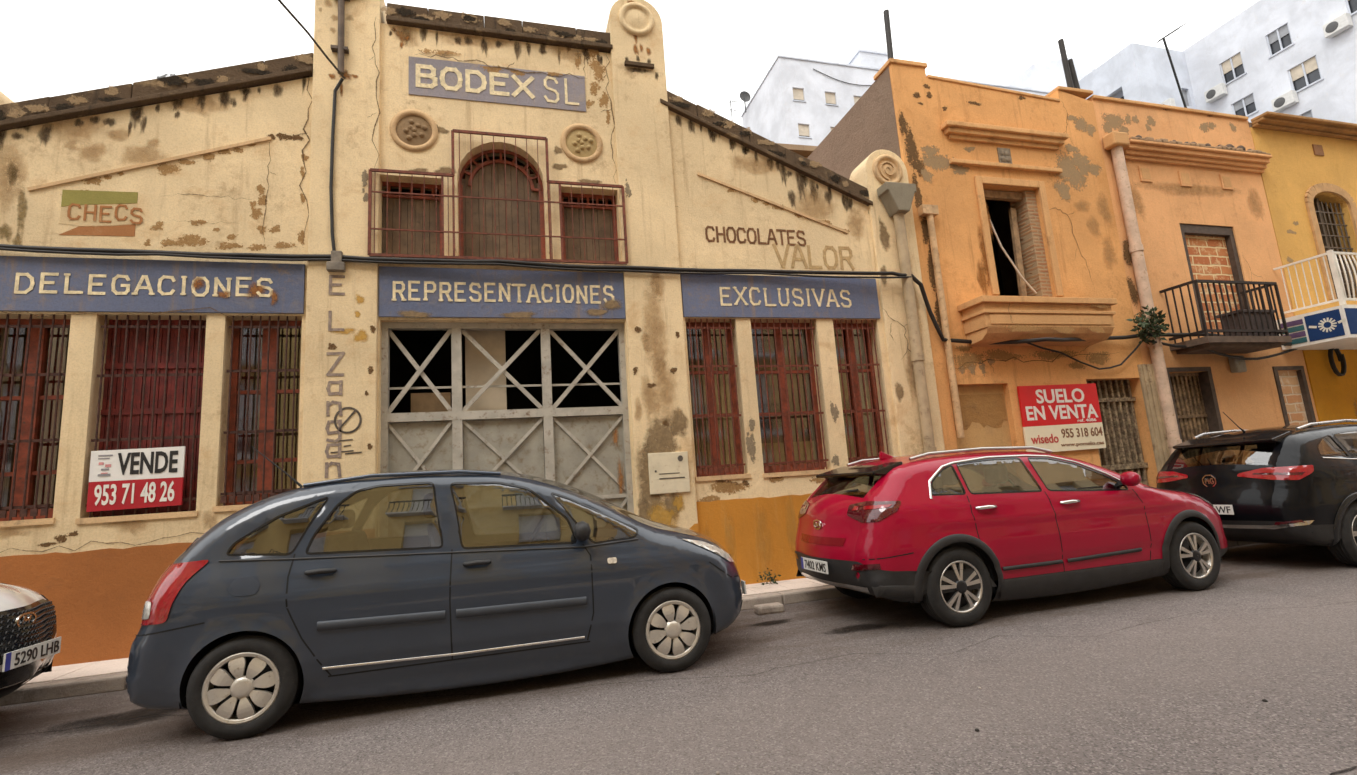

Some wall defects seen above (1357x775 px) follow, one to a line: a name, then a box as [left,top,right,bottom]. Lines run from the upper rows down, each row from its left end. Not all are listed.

leakage [389,28,438,44]
leakage [455,34,603,64]
leakage [0,85,281,159]
flaking render [1067,104,1168,137]
flaking render [1199,111,1236,133]
leakage [0,161,27,245]
leakage [676,115,860,225]
flaking render [898,111,975,334]
flaking render [1054,144,1102,209]
flaking render [638,409,687,520]
flaking render [697,480,752,502]
flaking render [746,416,756,464]